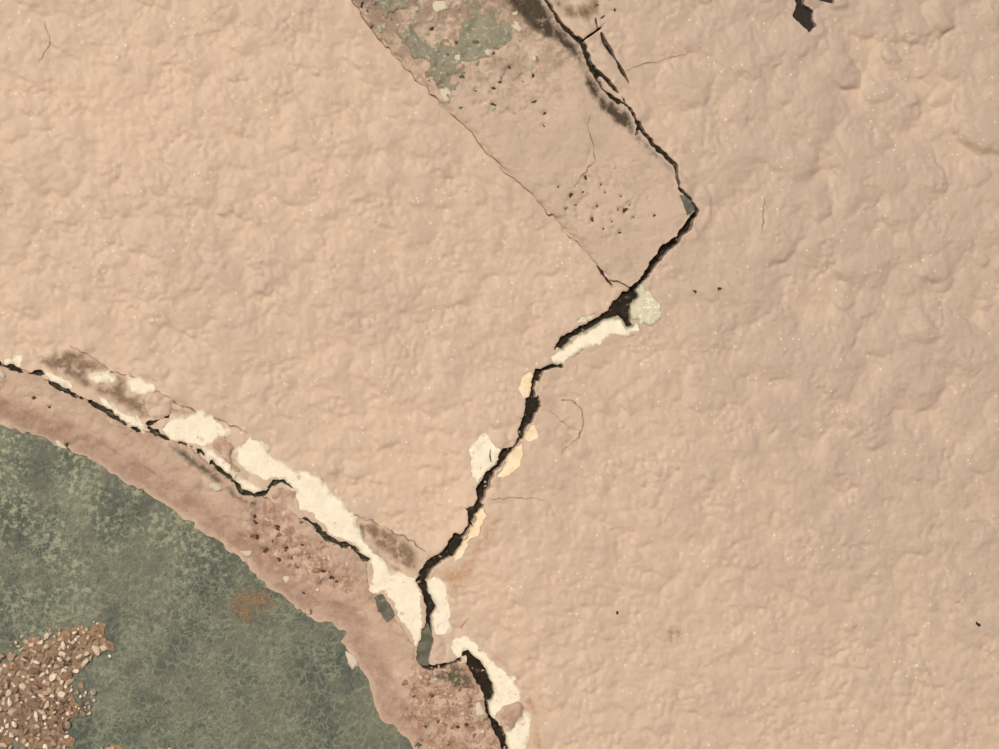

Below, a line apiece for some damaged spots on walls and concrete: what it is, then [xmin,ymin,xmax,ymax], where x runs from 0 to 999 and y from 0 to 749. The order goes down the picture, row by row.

peeling [360,0,523,112]
peeling [792,0,814,32]
peeling [0,352,22,378]
peeling [43,370,72,393]
crack [70,346,135,378]
crack [0,361,292,497]
crack [353,0,697,631]
peeling [89,370,538,749]
crack [302,517,370,561]
spalling [0,621,114,749]
crack [421,618,507,749]